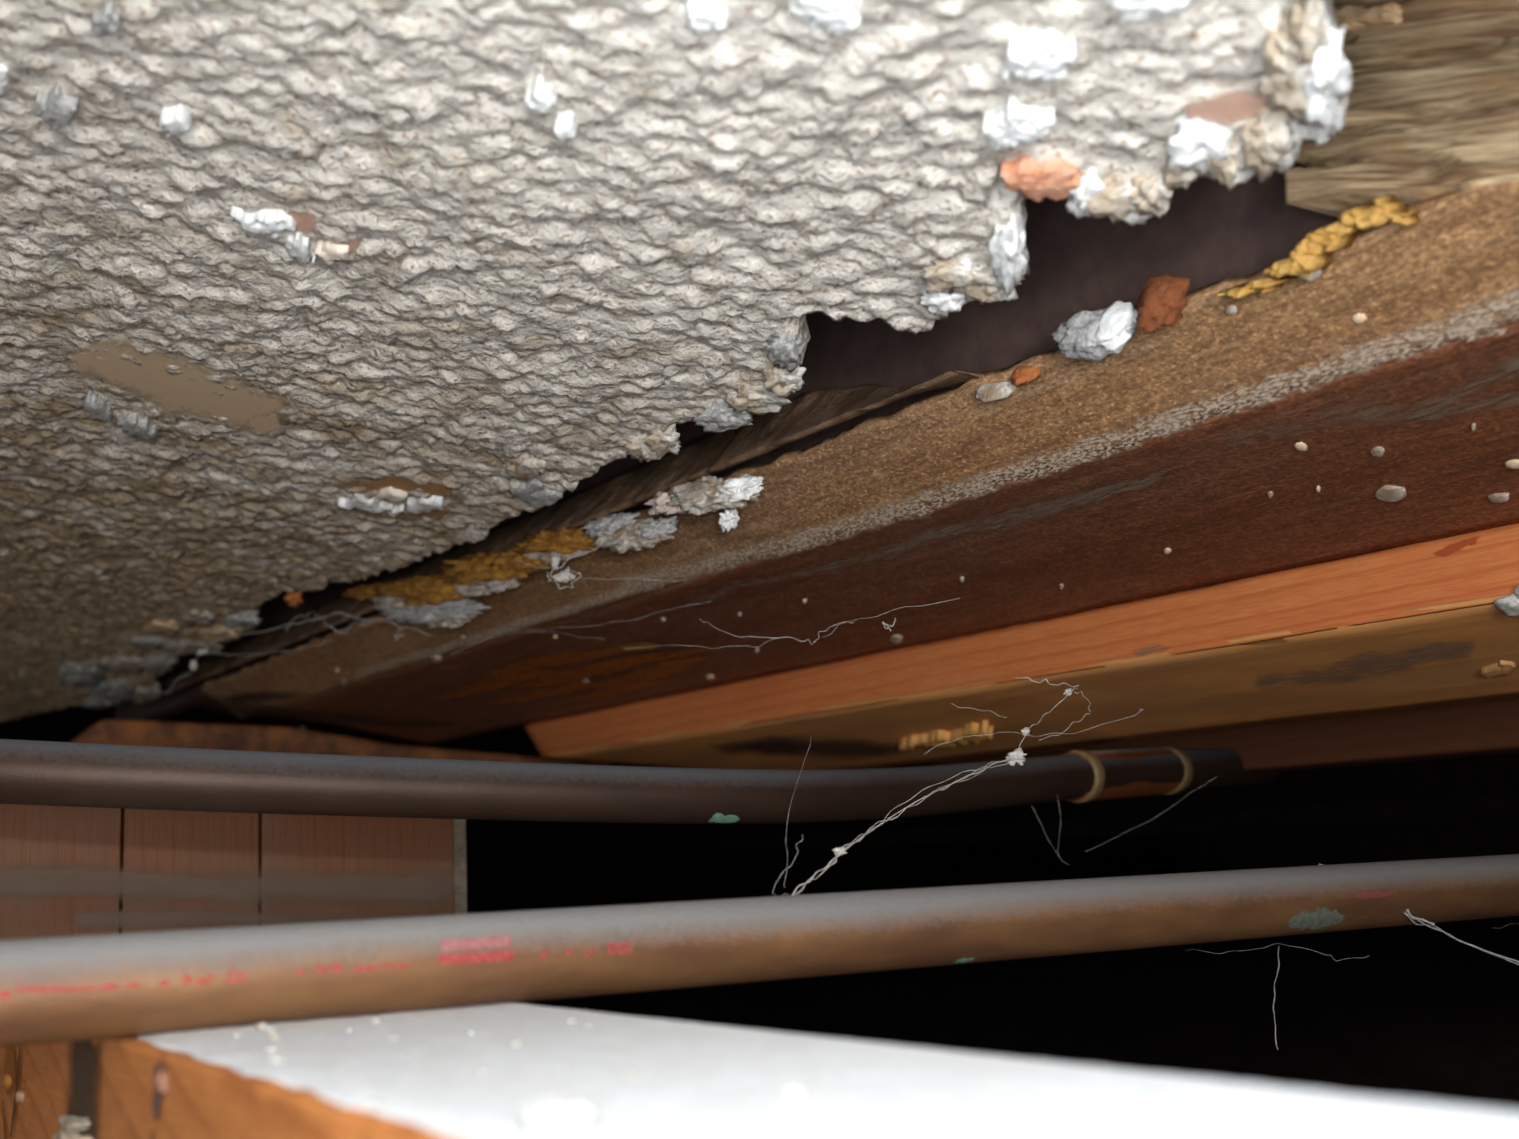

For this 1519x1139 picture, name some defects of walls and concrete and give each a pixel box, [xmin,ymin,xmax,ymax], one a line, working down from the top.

peeling [230,206,359,267]
peeling [83,388,157,441]
spalling [624,332,807,463]
peeling [338,486,444,518]
peeling [501,457,563,509]
spalling [284,591,304,608]
spalling [56,608,263,709]
leakage [68,1040,98,1139]